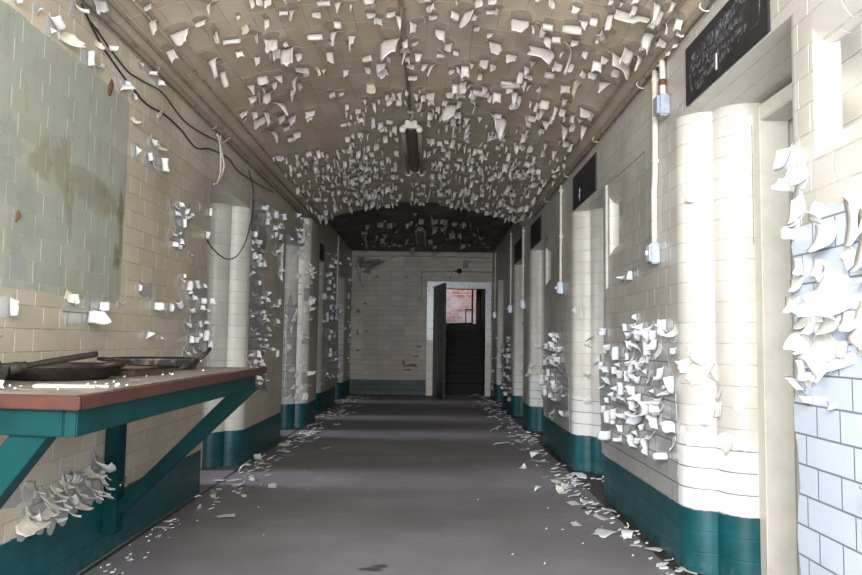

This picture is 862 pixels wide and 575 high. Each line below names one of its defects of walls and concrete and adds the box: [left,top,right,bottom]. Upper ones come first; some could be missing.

peeling [33,0,119,76]
peeling [107,76,138,101]
peeling [131,0,685,402]
peeling [0,295,19,319]
peeling [62,289,126,326]
peeling [771,143,862,575]
peeling [490,312,759,517]
peeling [0,451,128,542]